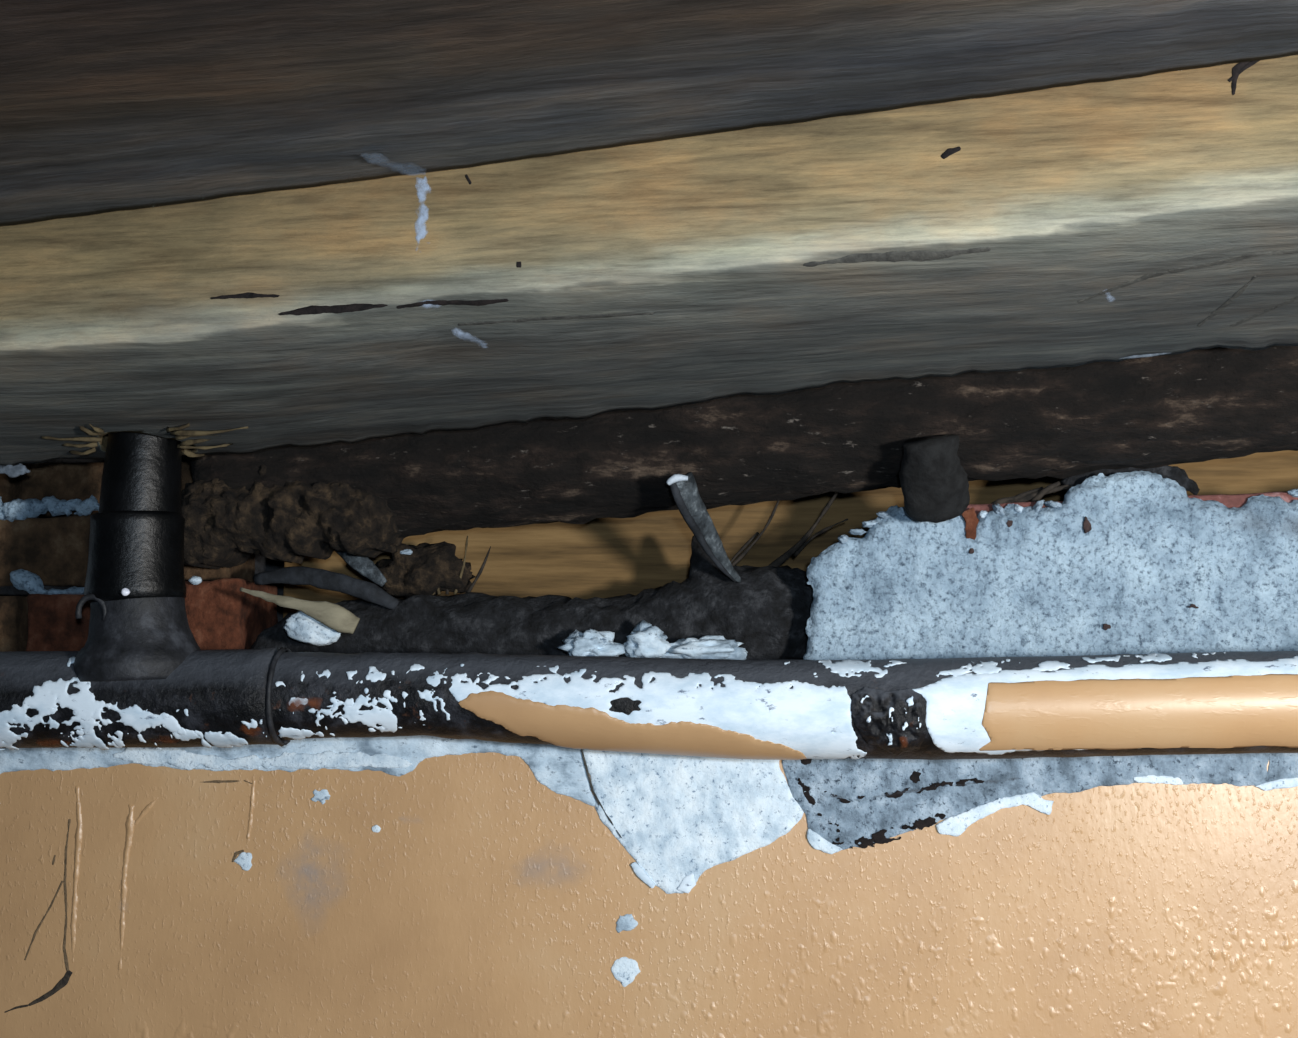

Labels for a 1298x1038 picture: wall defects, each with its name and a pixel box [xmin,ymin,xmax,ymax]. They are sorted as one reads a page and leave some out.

spalling [0,470,1298,894]
crack [4,819,72,1013]